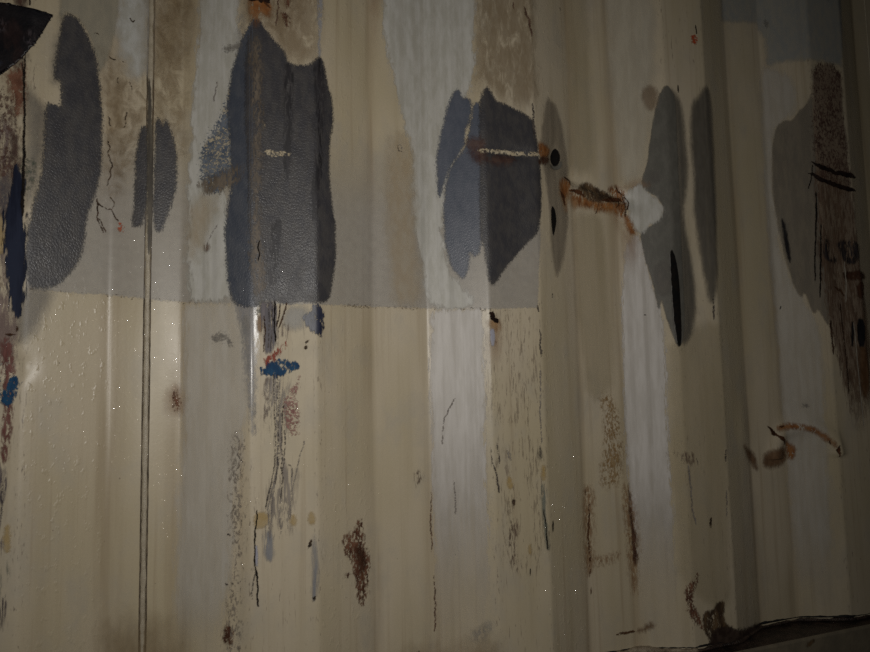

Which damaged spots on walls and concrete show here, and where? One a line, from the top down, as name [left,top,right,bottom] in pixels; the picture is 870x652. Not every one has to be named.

corrosion [560,177,635,234]
corrosion [745,423,841,469]
corrosion [343,519,370,606]